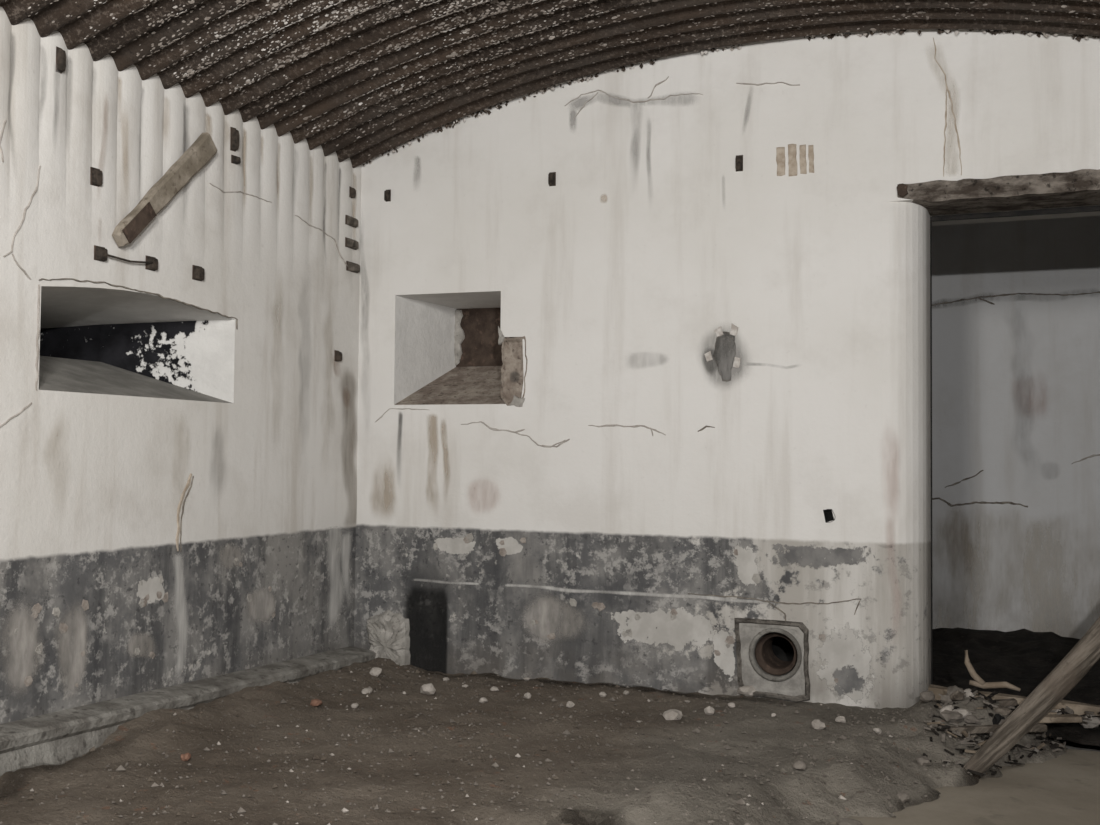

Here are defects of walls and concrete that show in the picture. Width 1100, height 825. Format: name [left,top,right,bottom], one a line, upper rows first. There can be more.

crack [932,291,1100,307]
spalling [704,323,742,382]
crack [461,421,666,448]
crack [932,470,1028,508]
peeling [433,533,476,555]
peeling [496,537,526,557]
peeling [733,545,761,586]
peeling [135,576,168,608]
peeling [526,597,582,640]
peeling [7,599,89,690]
peeling [592,602,736,682]
peeling [816,623,880,708]